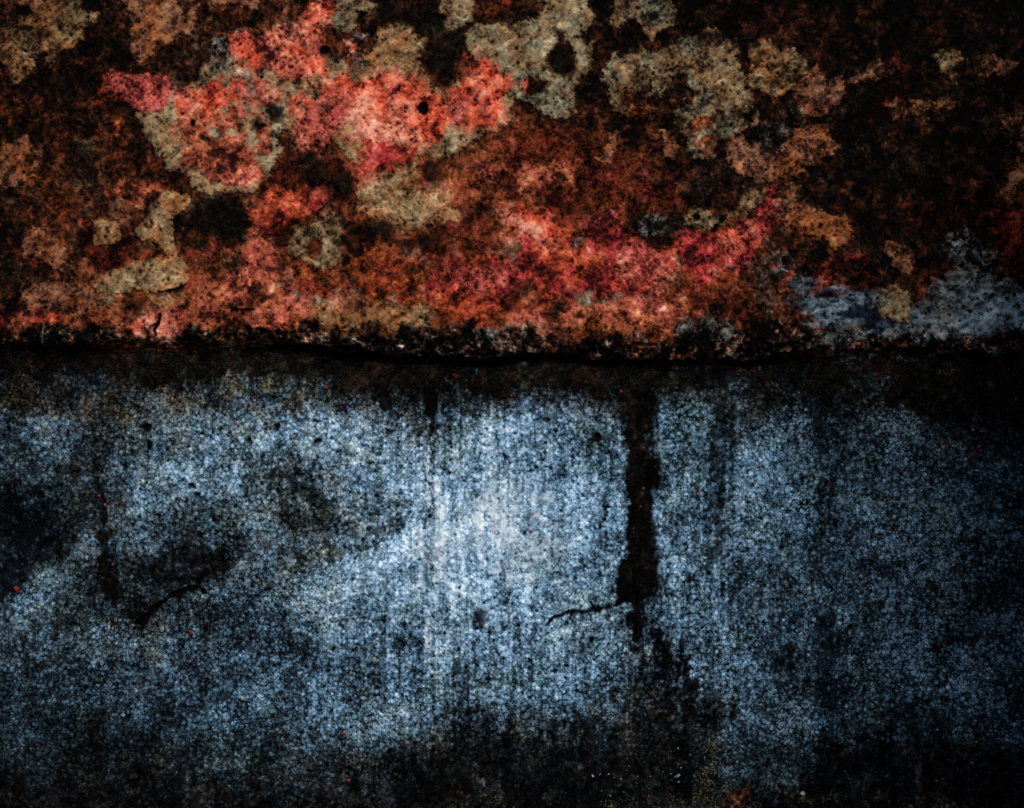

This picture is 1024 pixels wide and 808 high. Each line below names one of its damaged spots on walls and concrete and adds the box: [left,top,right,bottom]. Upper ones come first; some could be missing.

corrosion [112,119,124,142]
corrosion [615,83,657,119]
corrosion [689,115,718,154]
corrosion [495,123,688,215]
corrosion [67,207,164,275]
corrosion [290,203,521,328]
corrosion [577,279,765,343]
water stain [0,342,1024,808]
crack [545,592,638,626]